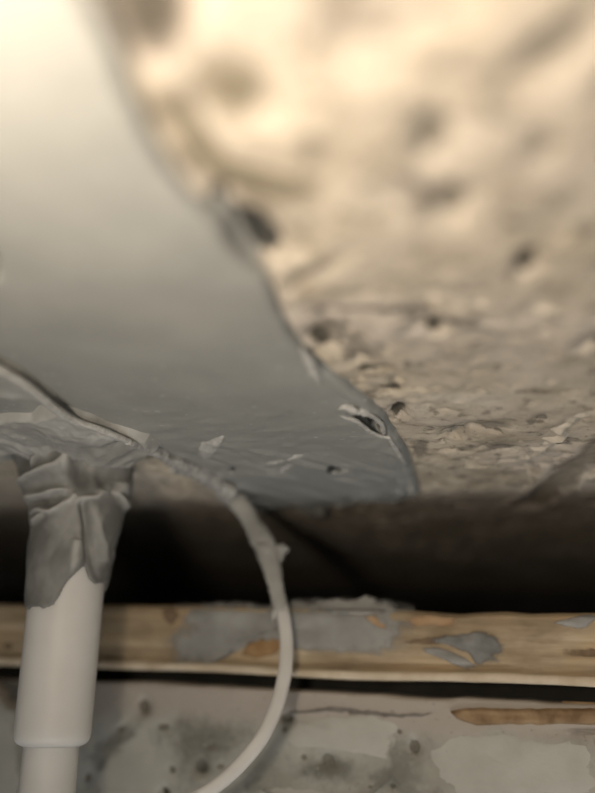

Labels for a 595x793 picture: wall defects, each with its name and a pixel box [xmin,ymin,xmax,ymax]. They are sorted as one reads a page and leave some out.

spalling [310,322,385,371]